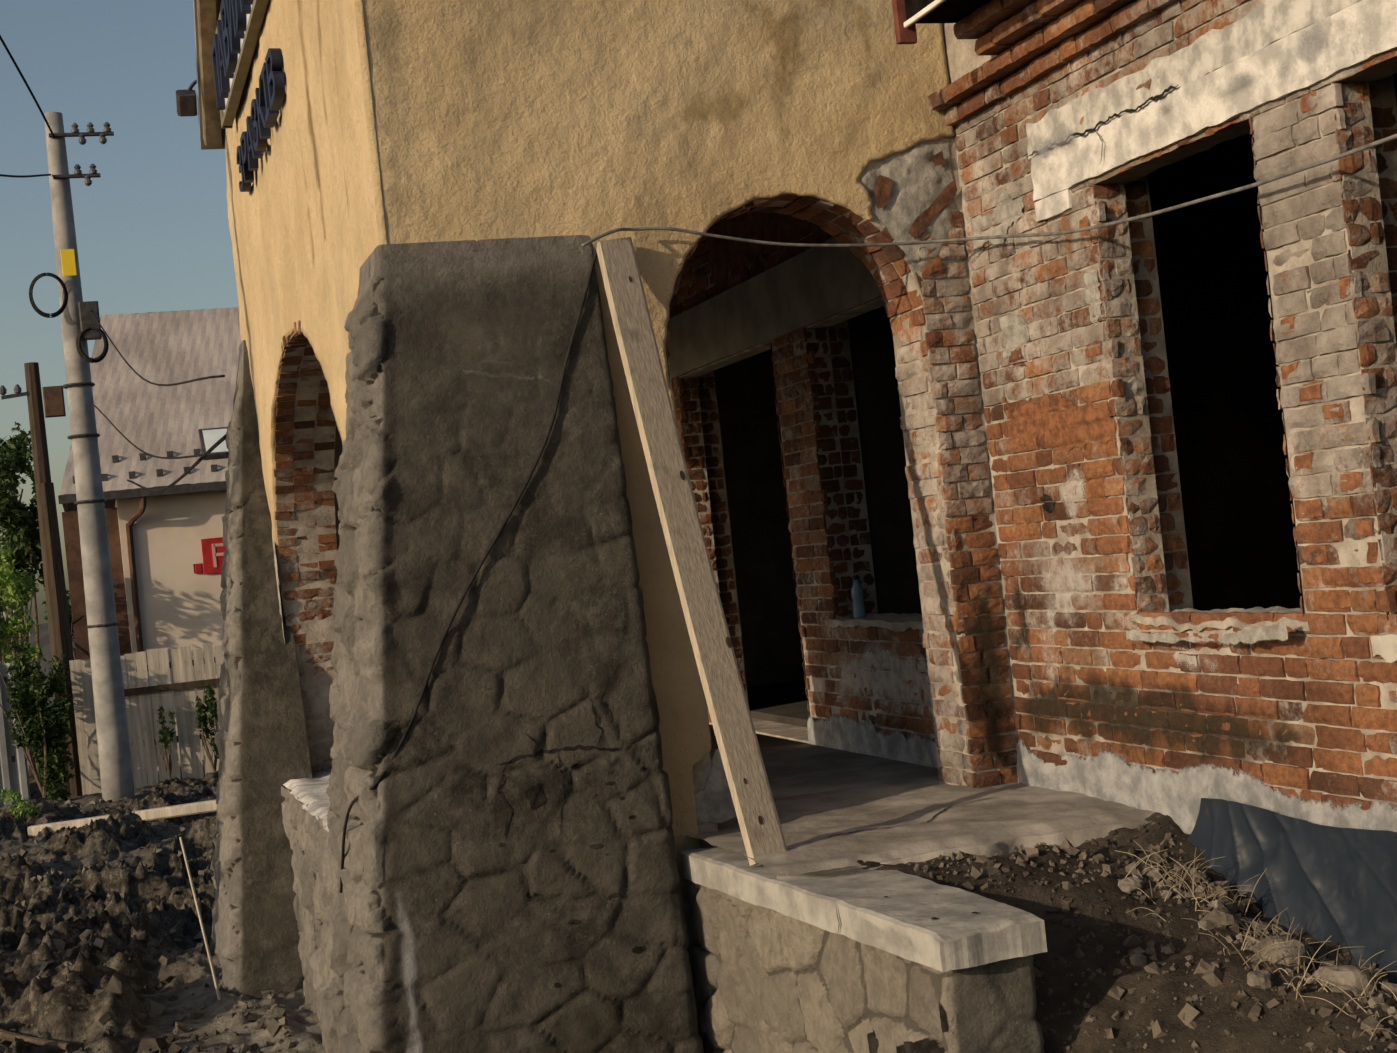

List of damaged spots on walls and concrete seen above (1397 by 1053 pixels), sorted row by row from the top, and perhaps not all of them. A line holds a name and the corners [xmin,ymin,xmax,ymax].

crack [1027,85,1178,164]
peeling [859,137,1031,283]
peeling [999,314,1029,367]
peeling [1084,271,1105,357]
damp [1062,470,1083,515]
damp [1015,590,1030,647]
damp [1046,558,1094,626]
damp [970,587,1006,762]
damp [1174,651,1200,667]
damp [1026,679,1294,760]
crack [497,699,623,842]